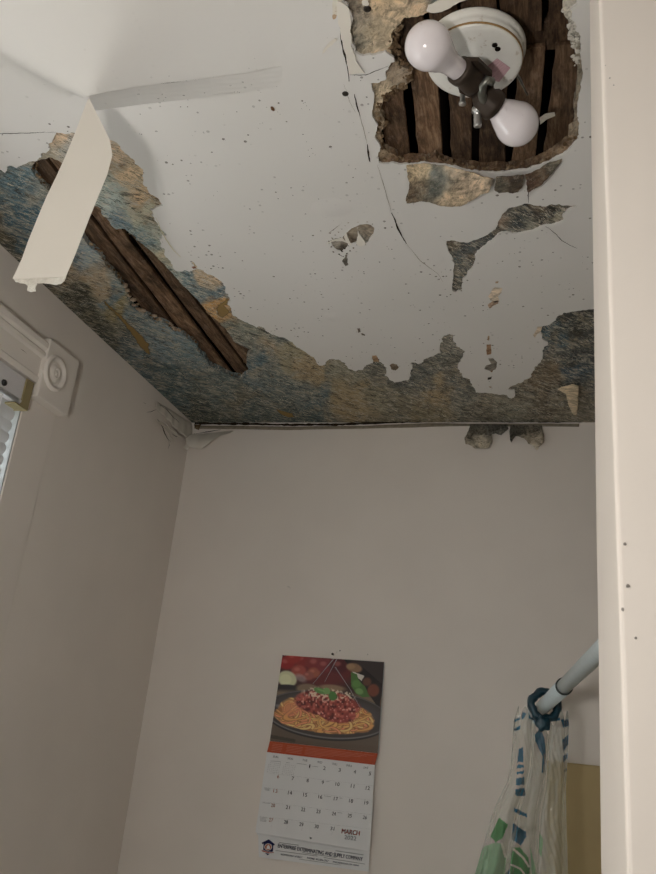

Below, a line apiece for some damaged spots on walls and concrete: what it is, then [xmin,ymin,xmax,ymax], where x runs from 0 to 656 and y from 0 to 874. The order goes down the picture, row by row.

peeling [0,132,75,262]
peeling [42,140,595,450]
crack [340,34,442,280]
spalling [332,0,583,207]